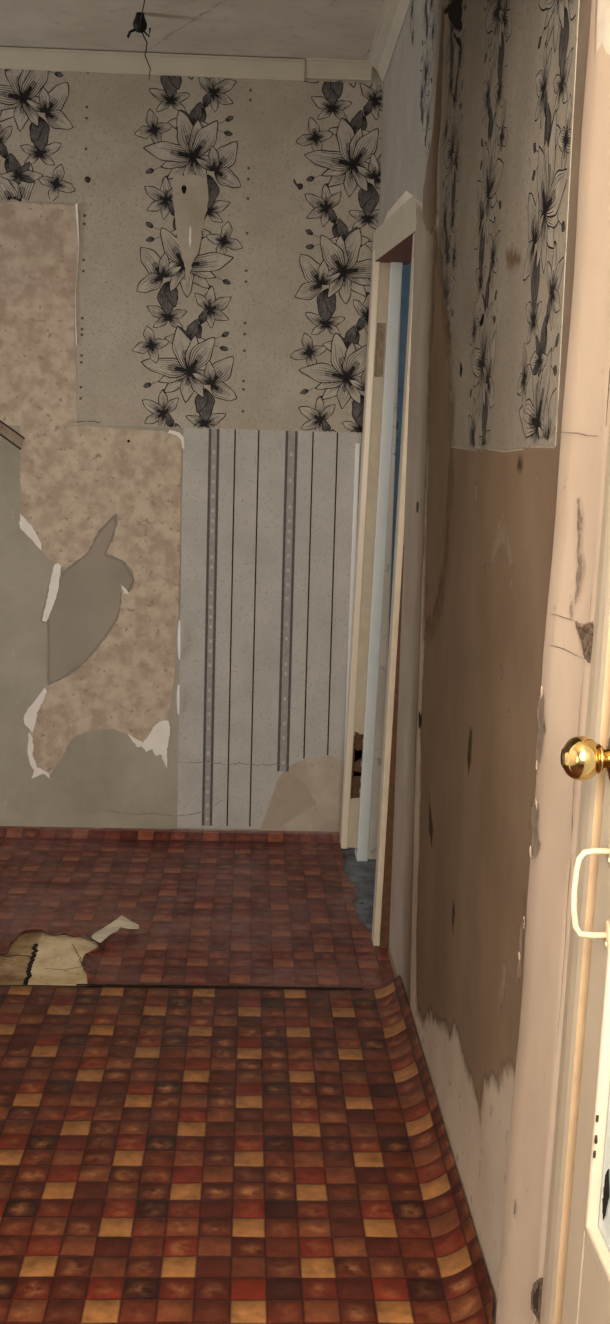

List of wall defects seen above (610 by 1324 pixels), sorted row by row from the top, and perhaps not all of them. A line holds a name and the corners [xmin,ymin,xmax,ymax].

peeling [172,174,209,285]
peeling [0,202,184,779]
peeling [535,686,546,770]
peeling [529,800,540,857]